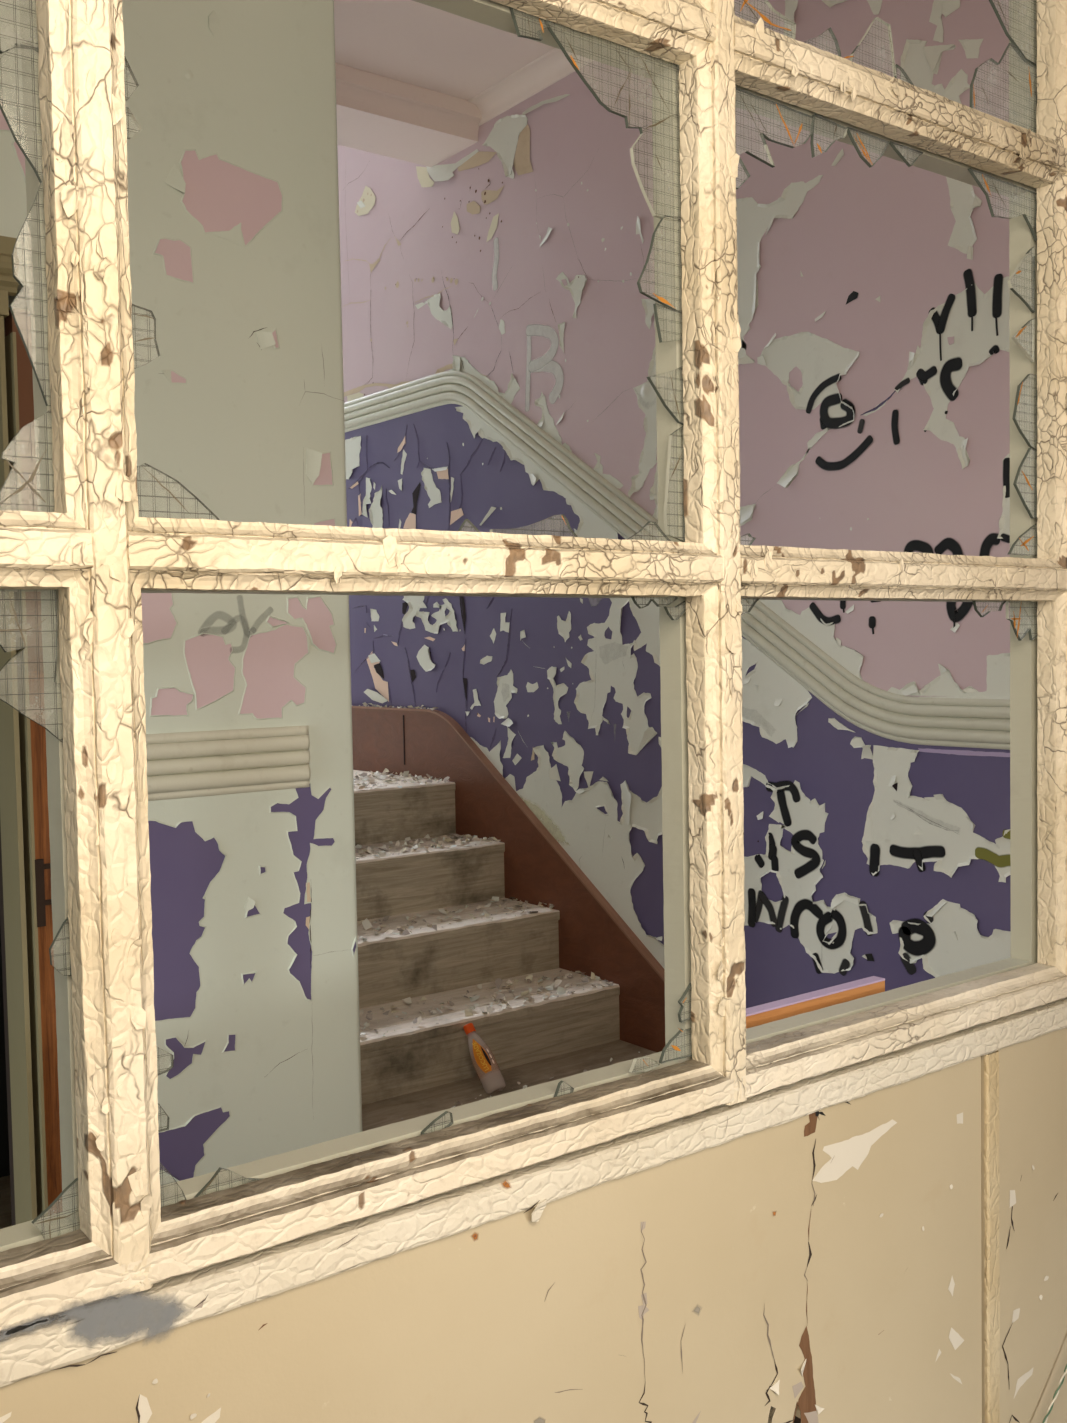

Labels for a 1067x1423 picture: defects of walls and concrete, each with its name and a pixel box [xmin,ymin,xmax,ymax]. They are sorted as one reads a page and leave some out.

peeling [416,94,570,252]
peeling [732,148,1010,526]
peeling [455,406,618,539]
peeling [120,593,337,720]
peeling [127,819,227,1081]
peeling [269,782,336,1001]
peeling [470,597,665,969]
peeling [743,764,1011,978]
peeling [828,718,1011,883]
peeling [804,1111,897,1183]
crack [621,1222,652,1423]
crack [763,1139,825,1423]